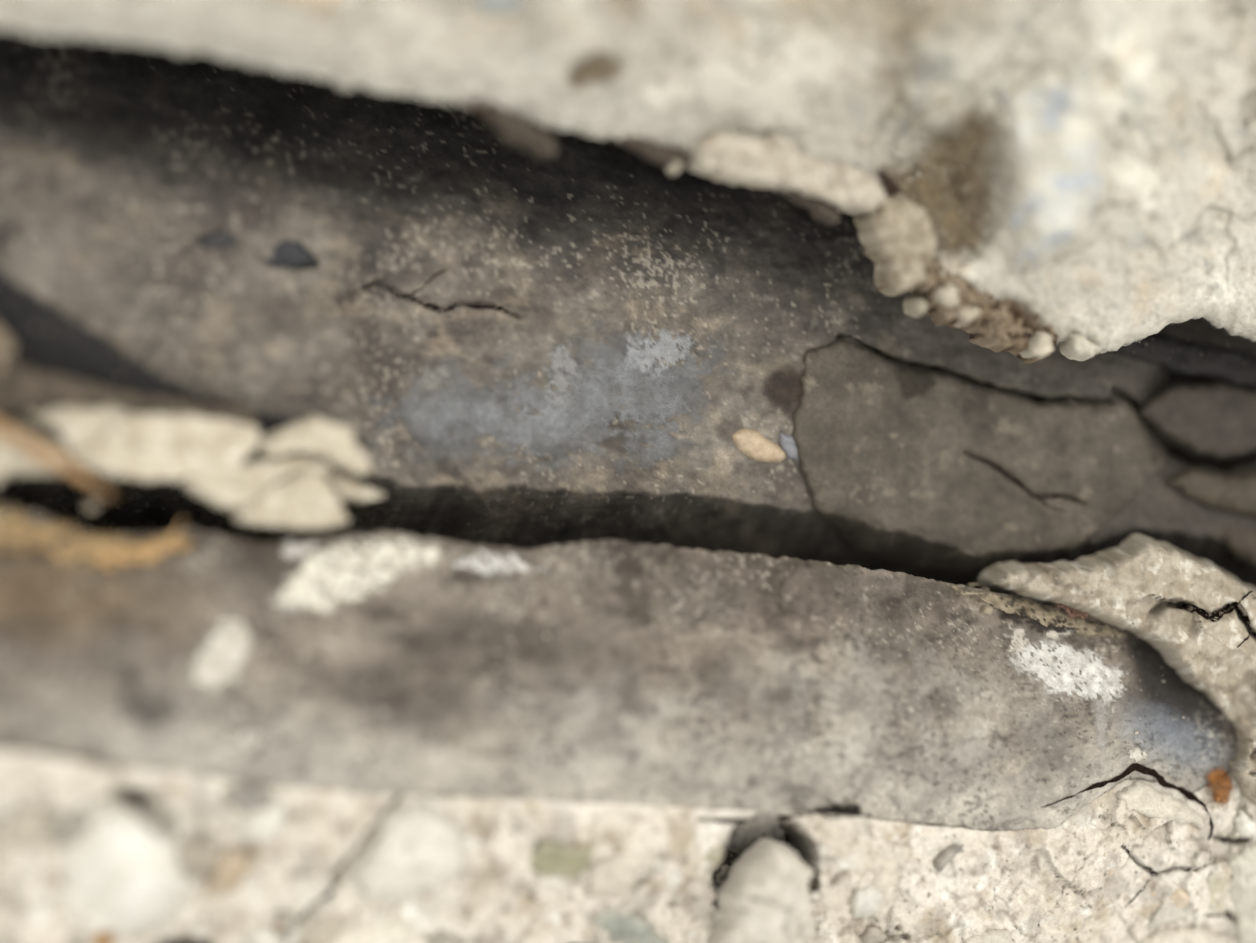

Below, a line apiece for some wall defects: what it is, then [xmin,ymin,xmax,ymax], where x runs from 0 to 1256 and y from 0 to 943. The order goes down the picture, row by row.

spalling [879,170,901,197]
crack [864,345,1140,409]
crack [969,455,1080,512]
crack [1167,447,1256,473]
peeling [0,504,199,570]
peeling [792,334,1256,806]
crack [1151,591,1256,648]
peeling [177,618,252,689]
spalling [116,791,152,808]
spalling [815,805,860,819]
crack [1040,763,1250,908]